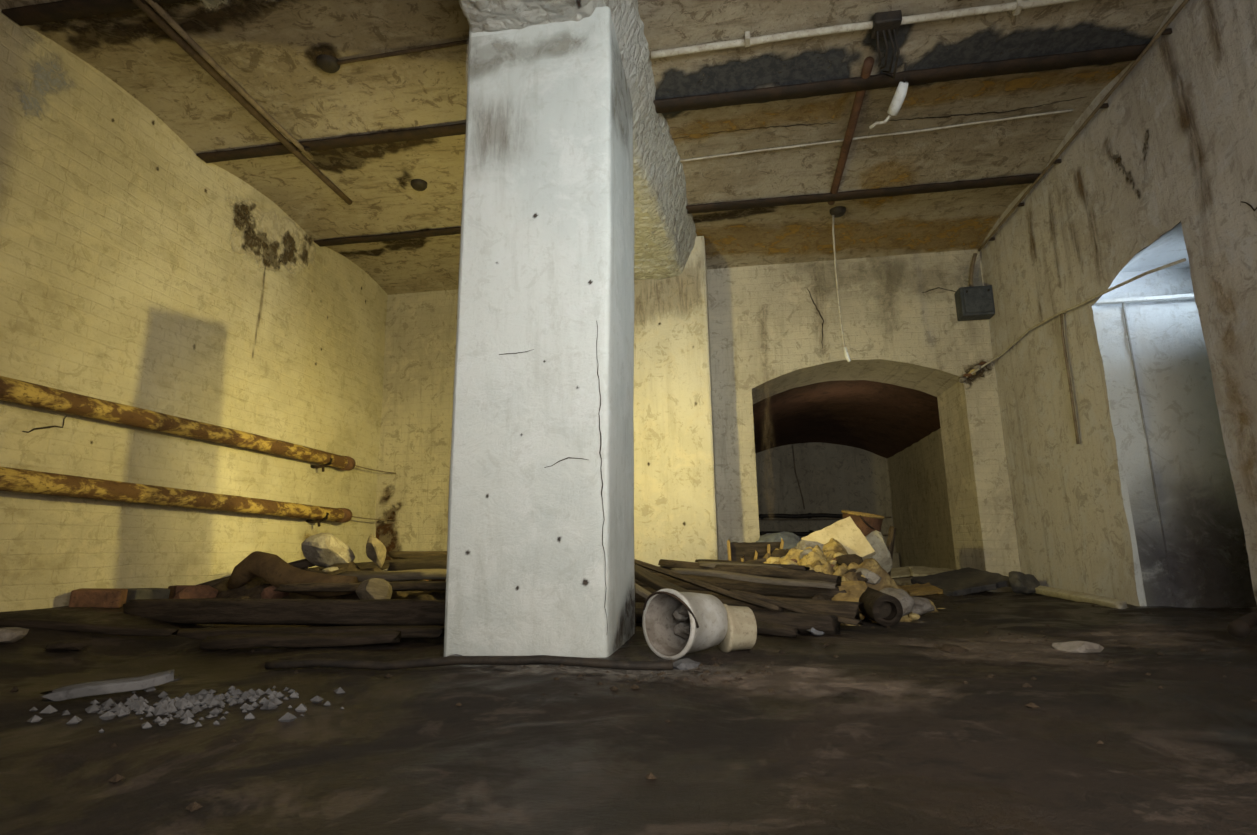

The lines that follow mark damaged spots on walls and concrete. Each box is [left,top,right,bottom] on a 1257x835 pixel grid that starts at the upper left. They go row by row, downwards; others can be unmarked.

damp [655,15,1182,140]